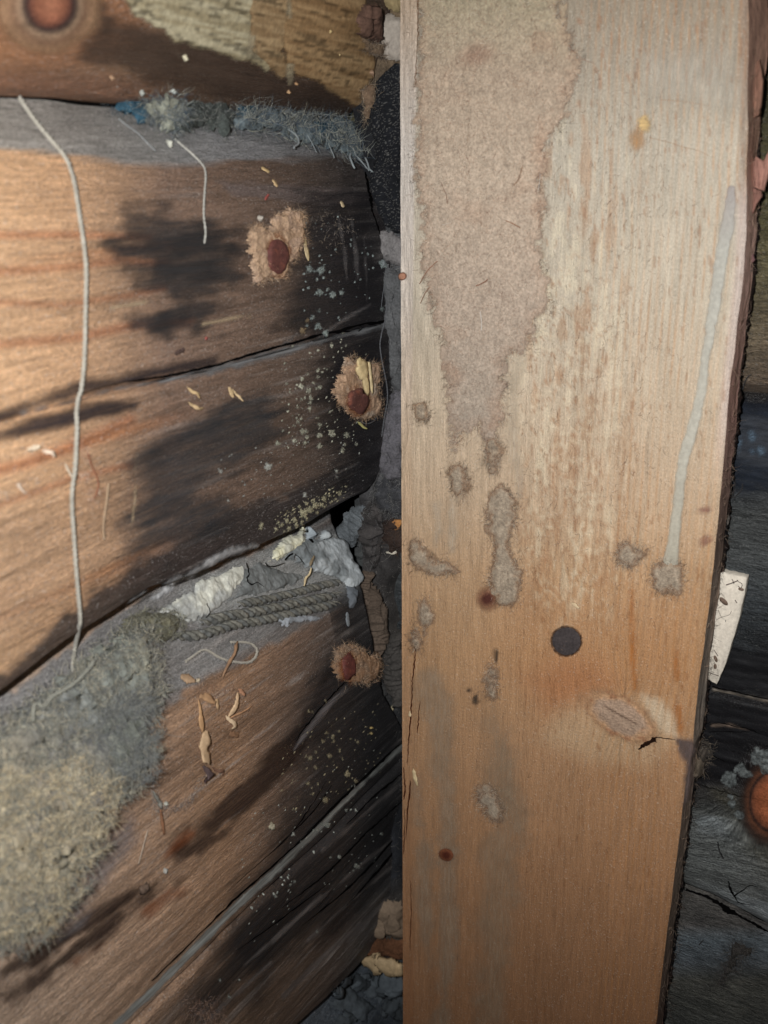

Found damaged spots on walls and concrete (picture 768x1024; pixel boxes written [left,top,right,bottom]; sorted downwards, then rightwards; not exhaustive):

crack [638,737,675,750]